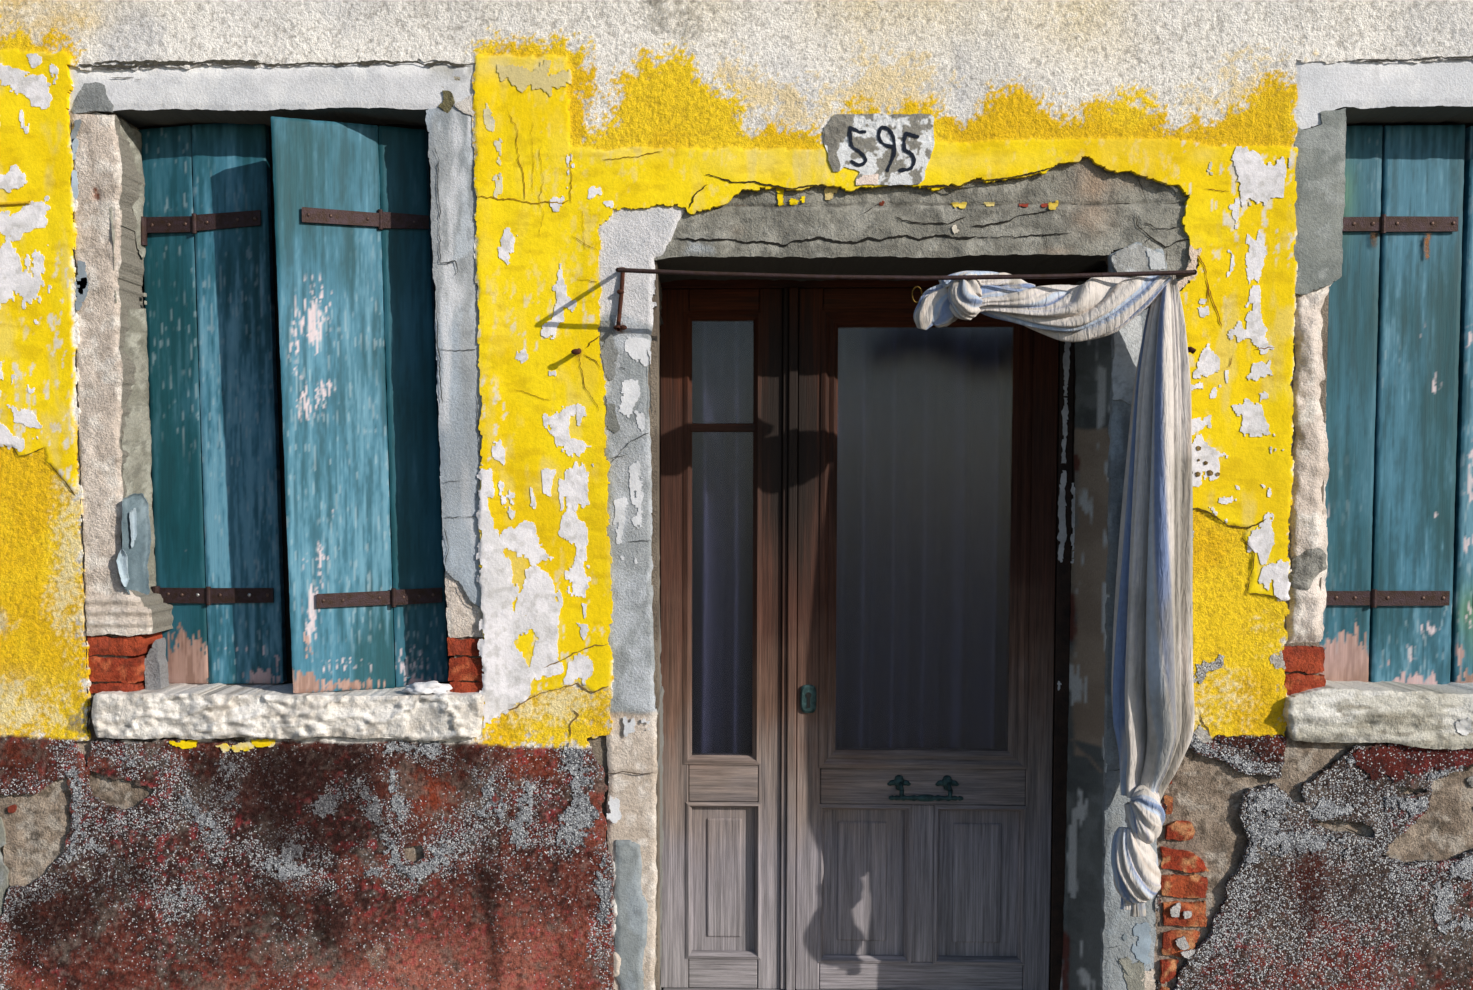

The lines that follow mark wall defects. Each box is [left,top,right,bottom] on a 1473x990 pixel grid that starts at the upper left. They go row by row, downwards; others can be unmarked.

peeling [0,53,59,134]
flaking render [70,82,114,200]
peeling [0,361,43,452]
peeling [0,164,52,324]
peeling [541,263,577,339]
peeling [600,320,651,433]
peeling [1191,146,1292,523]
peeling [476,403,594,728]
peeling [1247,484,1327,601]
flaking render [0,738,154,917]
flaking render [169,739,275,845]
flaking render [1118,717,1473,990]